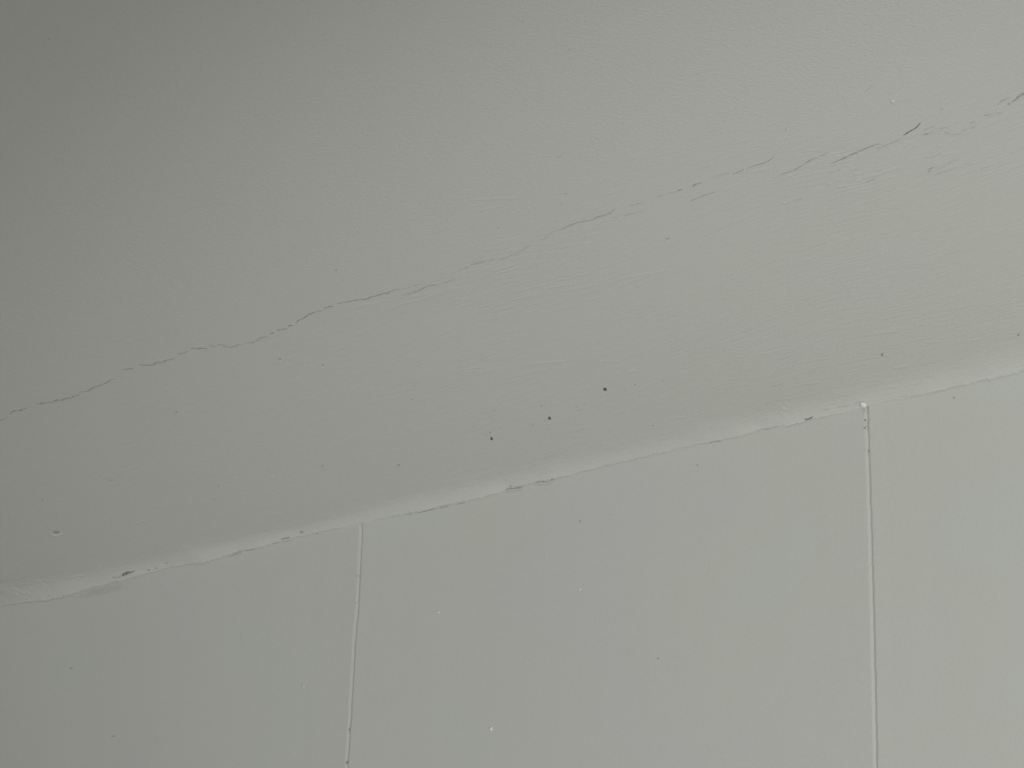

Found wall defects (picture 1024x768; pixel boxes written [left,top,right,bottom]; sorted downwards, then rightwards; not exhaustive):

crack [0,92,1024,422]